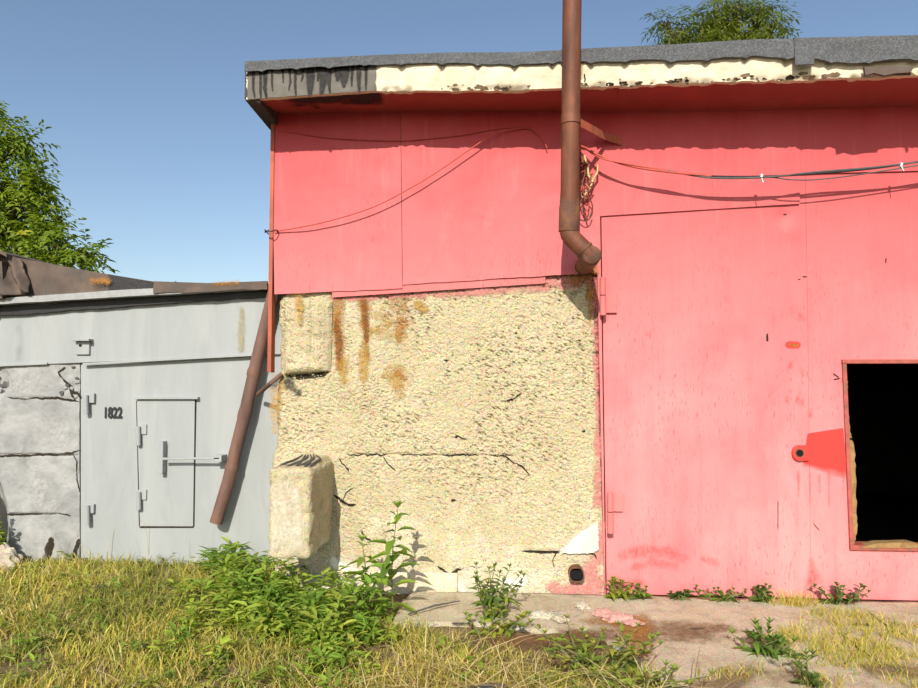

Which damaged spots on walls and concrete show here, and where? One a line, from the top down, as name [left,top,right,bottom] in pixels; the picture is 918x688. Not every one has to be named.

leakage [247,65,382,108]
spalling [581,79,653,88]
spalling [665,71,841,84]
corrosion [331,295,348,383]
corrosion [358,293,428,382]
corrosion [382,368,405,394]
crack [334,434,530,507]
crack [522,550,560,567]